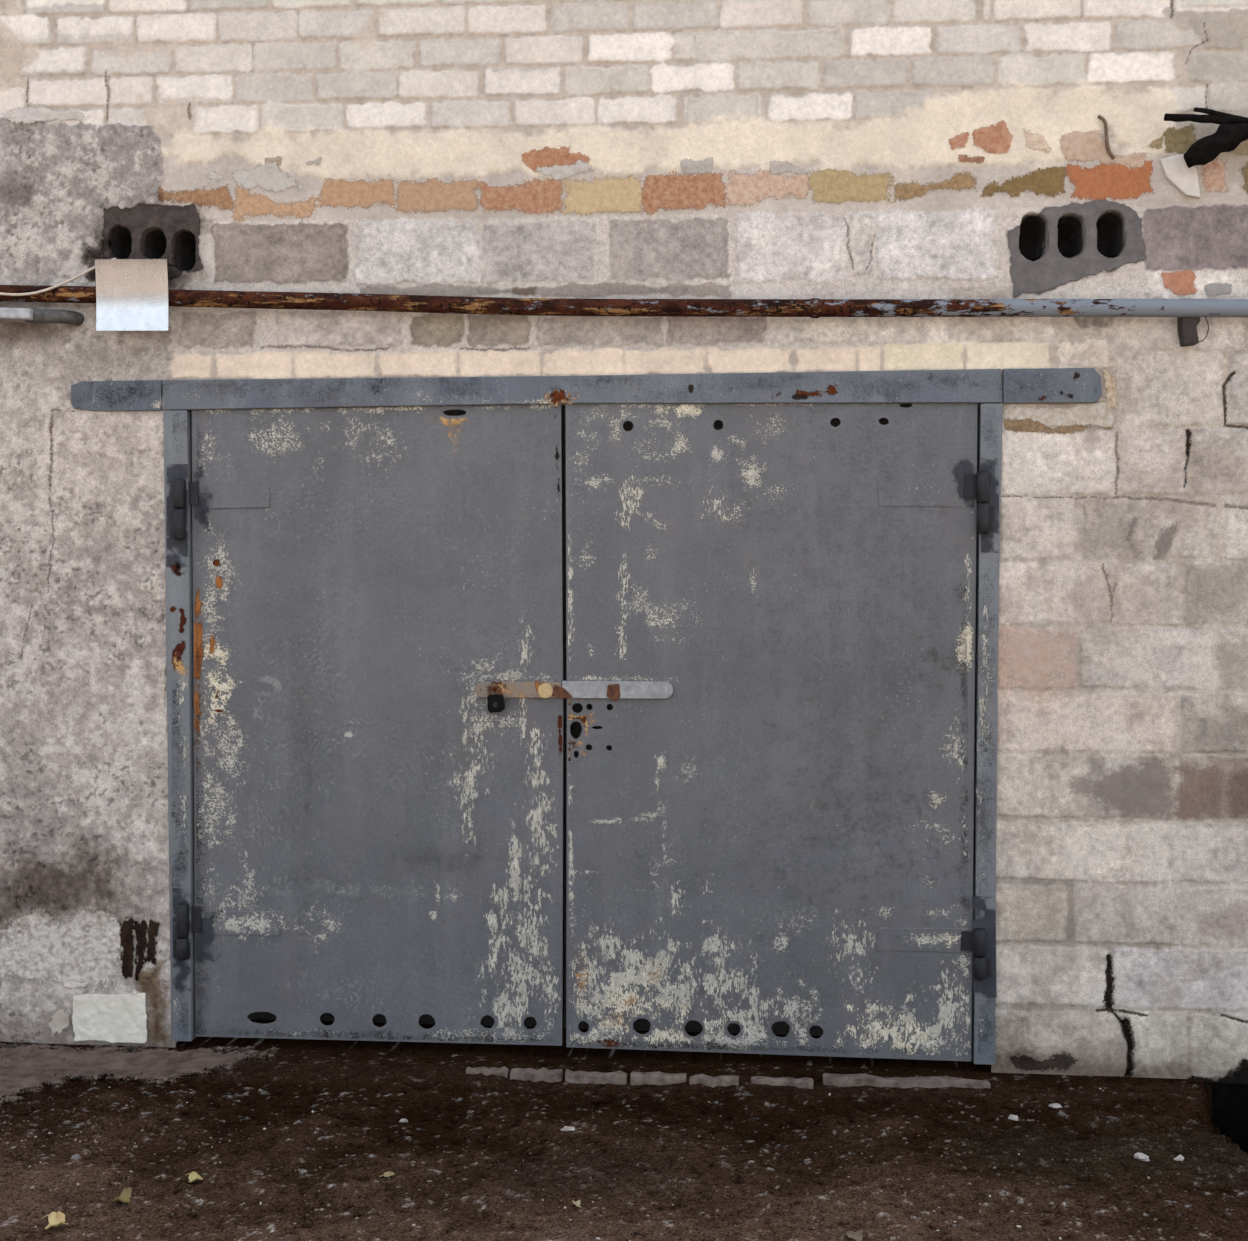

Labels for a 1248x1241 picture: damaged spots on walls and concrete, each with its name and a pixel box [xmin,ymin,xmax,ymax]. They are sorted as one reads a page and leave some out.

peeling [157,120,1197,222]
peeling [1201,140,1248,196]
corrosion [776,385,837,400]
crack [1222,372,1248,429]
crack [1001,429,1248,509]
corrosion [213,558,223,589]
corrosion [170,590,223,744]
corrosion [557,699,594,761]
peeling [406,519,997,1056]
crack [1096,954,1147,1077]